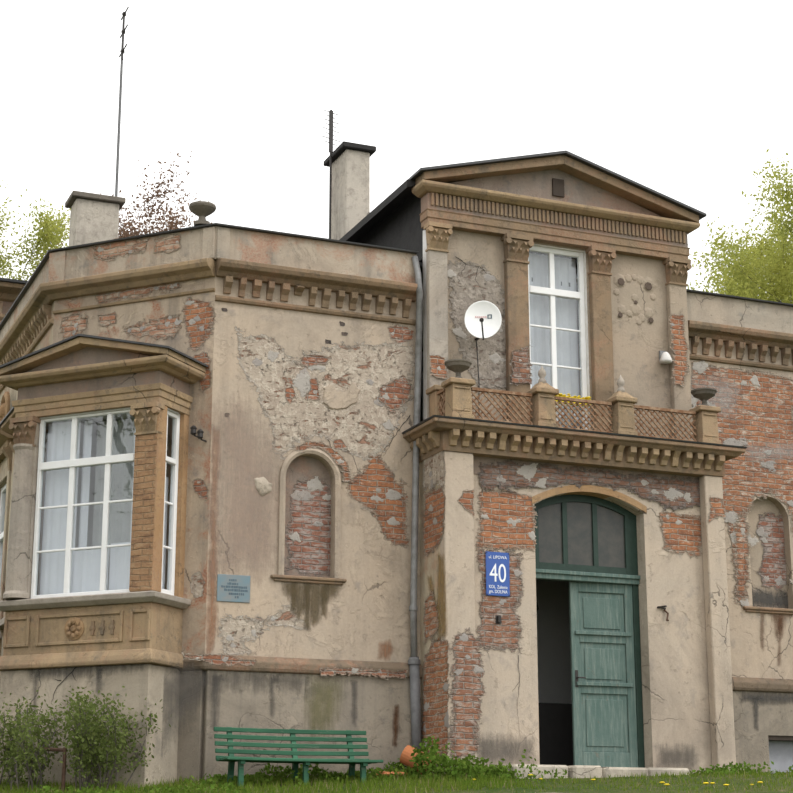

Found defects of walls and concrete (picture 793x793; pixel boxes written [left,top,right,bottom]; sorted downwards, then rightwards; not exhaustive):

flaking render [92,234,181,261]
flaking render [59,296,227,393]
peeling [232,321,415,549]
flaking render [284,476,331,577]
flaking render [421,313,793,760]
peeling [182,602,310,666]
water stain [285,583,337,629]
flaking render [319,667,408,680]
water stain [742,693,793,728]